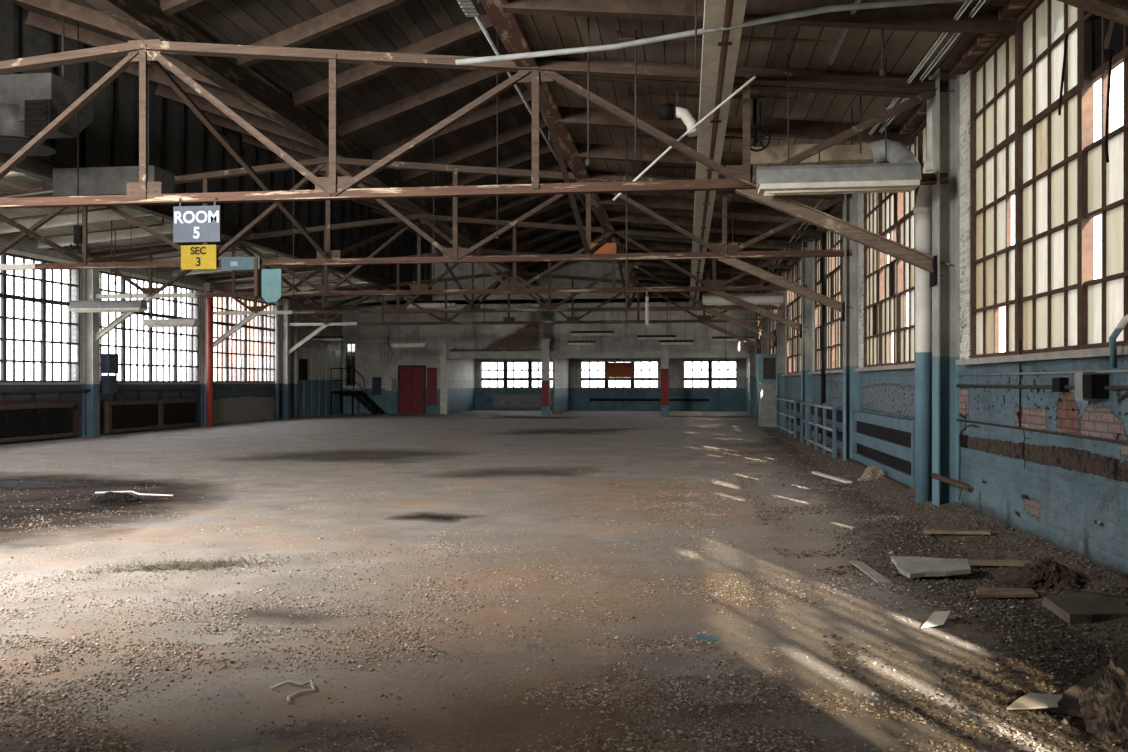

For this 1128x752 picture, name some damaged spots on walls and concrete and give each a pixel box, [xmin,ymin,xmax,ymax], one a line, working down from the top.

spalling [959,369,1128,483]